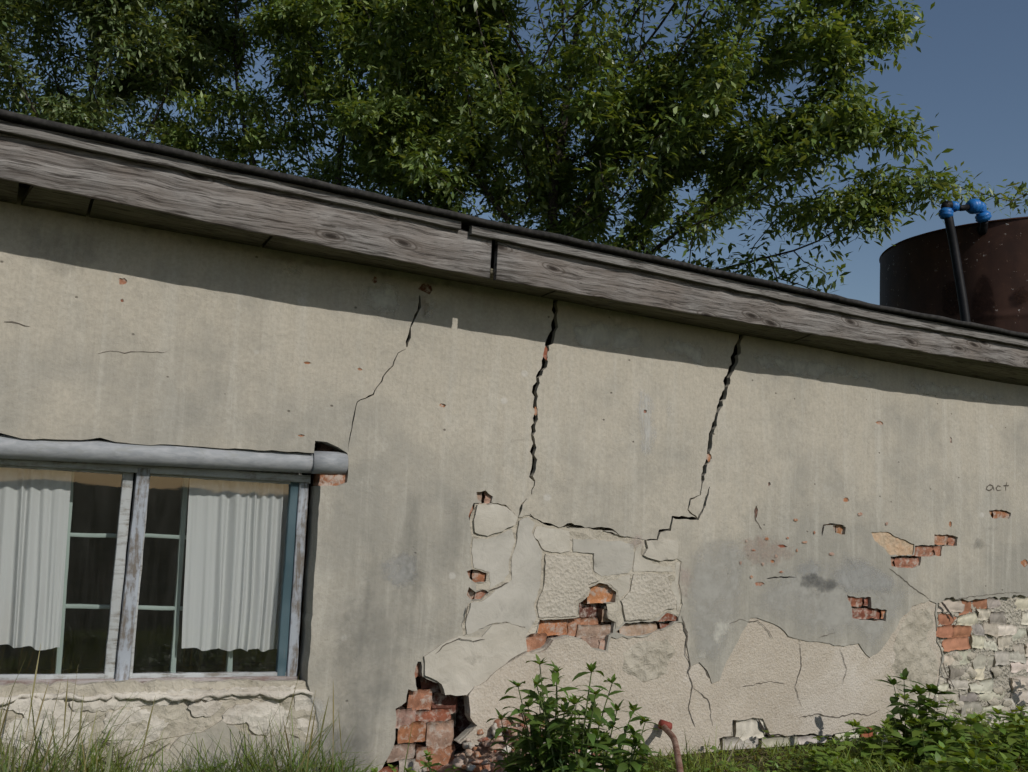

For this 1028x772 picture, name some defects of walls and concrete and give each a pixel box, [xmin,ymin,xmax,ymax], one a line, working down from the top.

flaking render [469,491,491,519]
flaking render [467,569,487,600]
flaking render [379,662,471,772]